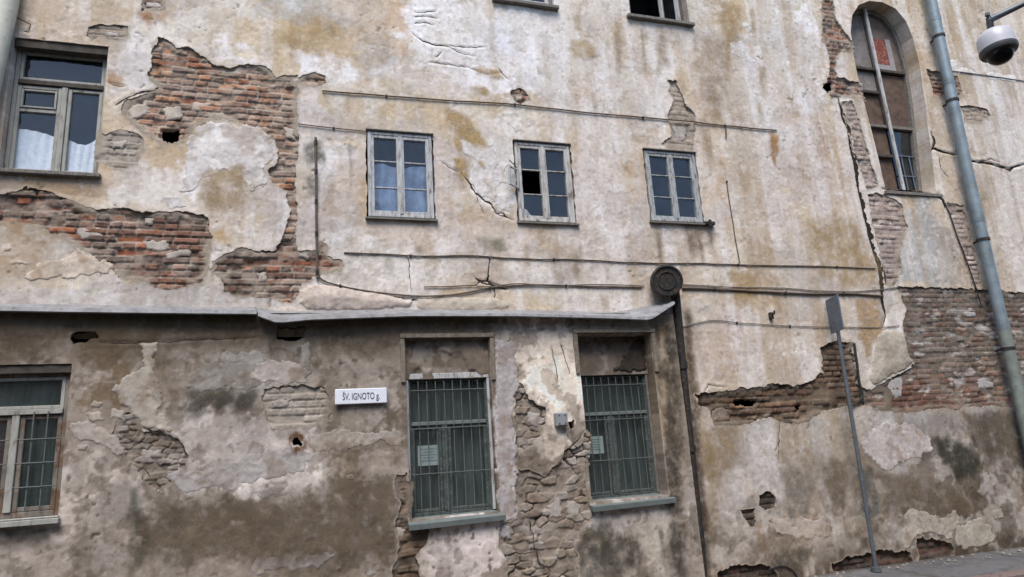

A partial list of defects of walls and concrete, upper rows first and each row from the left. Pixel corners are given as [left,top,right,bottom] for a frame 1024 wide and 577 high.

crack [414,11,508,79]
flaking render [0,38,344,303]
crack [441,161,510,219]
flaking render [695,0,1016,471]
flaking render [1002,290,1024,384]
flaking render [69,337,403,499]
flaking render [494,339,540,539]
damp [934,411,1024,478]
damp [131,481,396,565]
flaking render [367,470,429,577]
flaking render [741,491,832,540]
flaking render [831,508,1004,571]